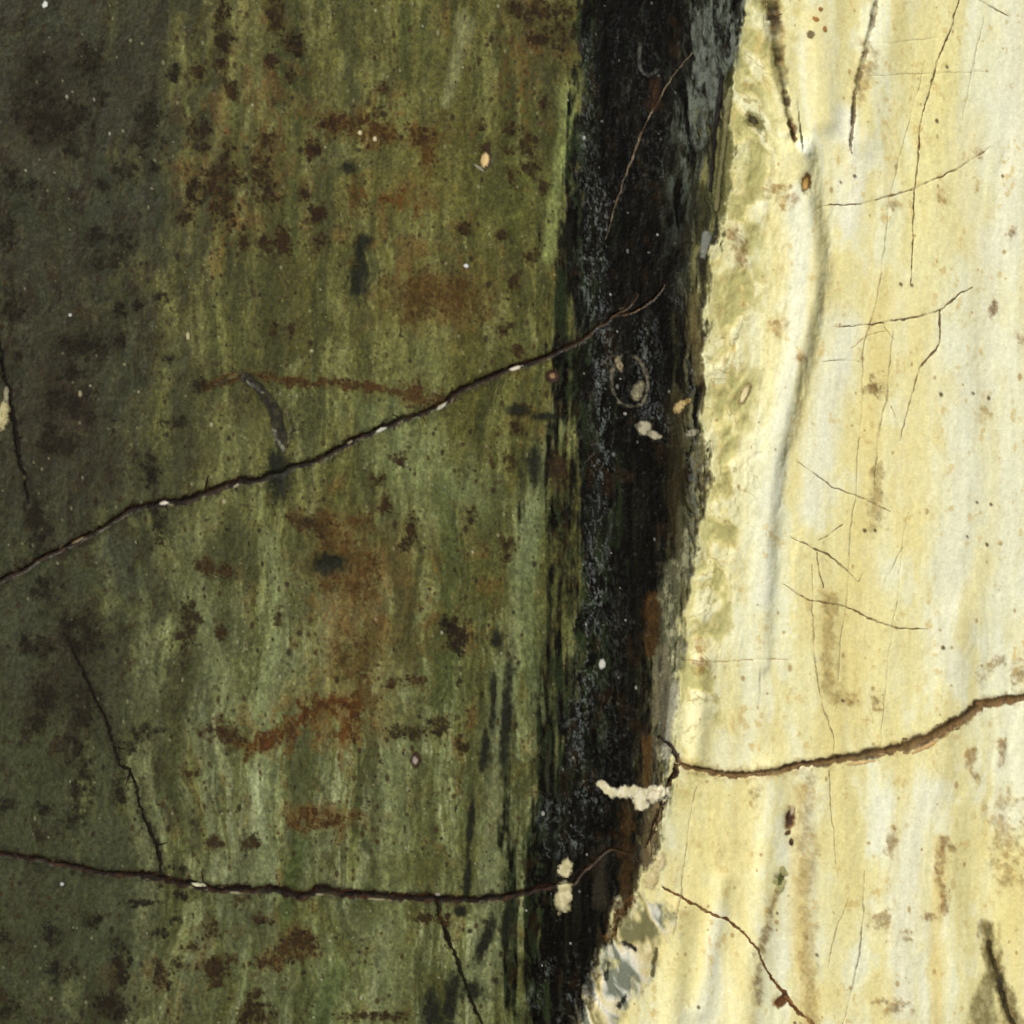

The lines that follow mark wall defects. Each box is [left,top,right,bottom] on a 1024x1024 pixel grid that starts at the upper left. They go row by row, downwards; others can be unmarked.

rust [178,133,293,253]
rust [305,139,321,162]
rust [299,189,327,250]
rust [317,106,439,163]
rust [504,121,549,192]
crack [828,0,959,284]
crack [842,290,967,384]
crack [0,284,665,583]
damp [526,448,541,483]
crack [784,524,872,636]
rust [199,670,372,762]
crack [0,632,1024,1024]